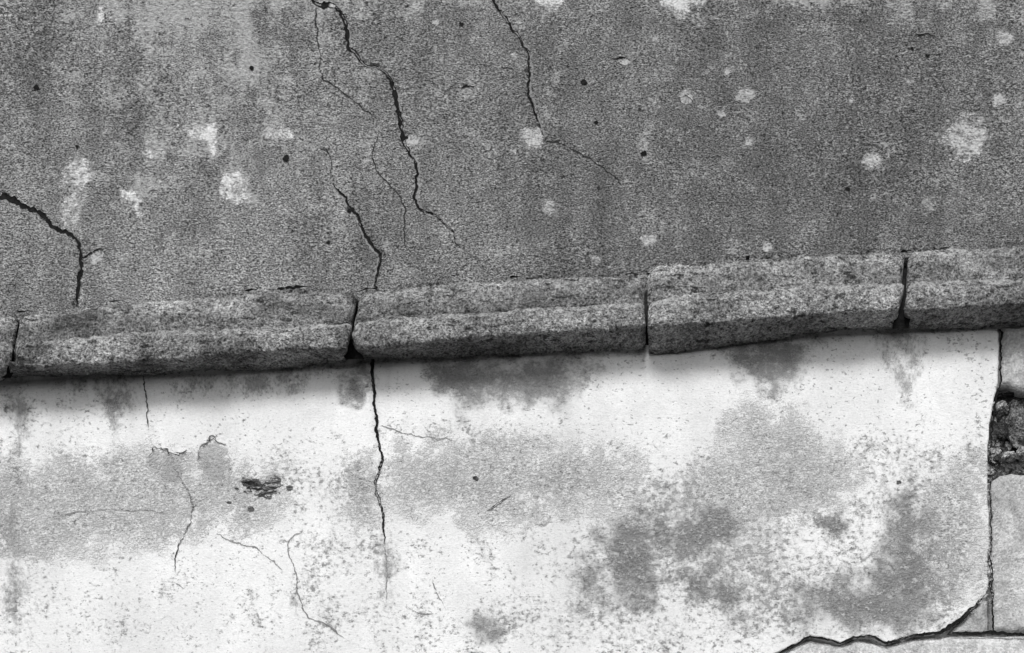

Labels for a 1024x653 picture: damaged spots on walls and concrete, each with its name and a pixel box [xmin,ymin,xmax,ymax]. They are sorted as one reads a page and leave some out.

crack [311,0,492,292]
crack [469,0,623,187]
crack [0,192,104,306]
damp [425,353,588,405]
damp [733,340,804,397]
peeling [0,433,293,564]
crack [219,533,344,638]
crack [369,359,452,599]
damp [576,509,736,613]
damp [676,566,743,621]
damp [792,490,947,633]
crack [779,329,1024,653]